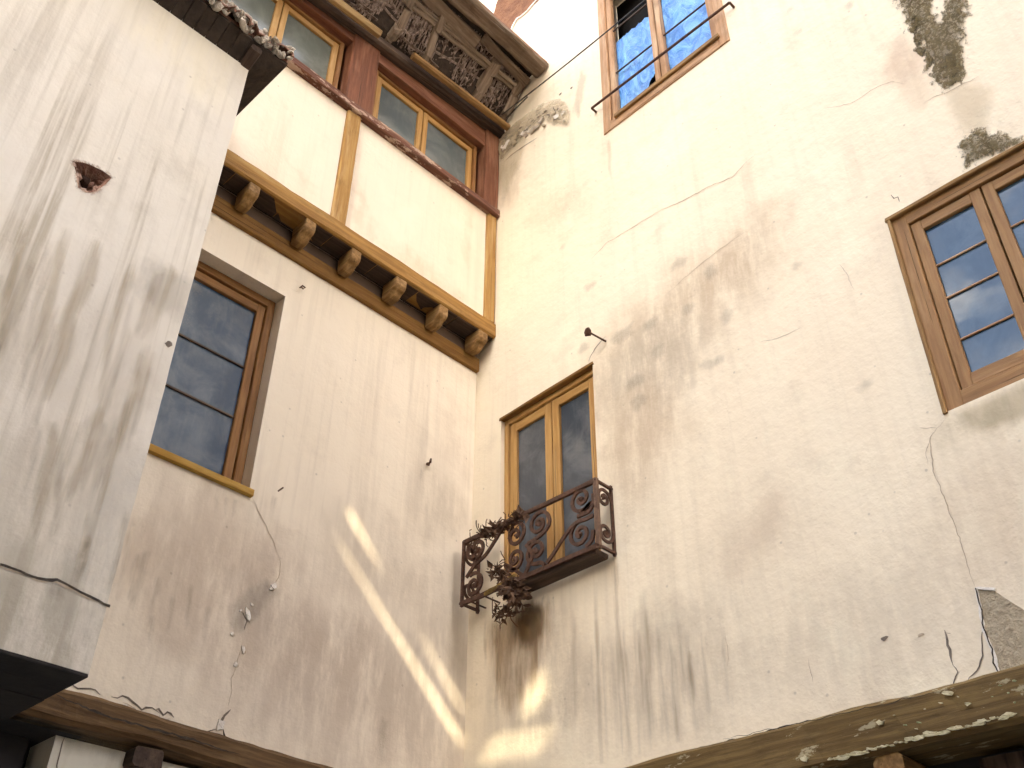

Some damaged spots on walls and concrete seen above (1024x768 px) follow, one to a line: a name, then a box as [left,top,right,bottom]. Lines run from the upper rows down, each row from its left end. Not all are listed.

spalling [498,87,572,161]
spalling [73,160,109,192]
crack [0,563,110,608]
crack [252,498,281,590]
crack [924,418,974,583]
crack [57,650,241,754]
spalling [827,587,1024,760]